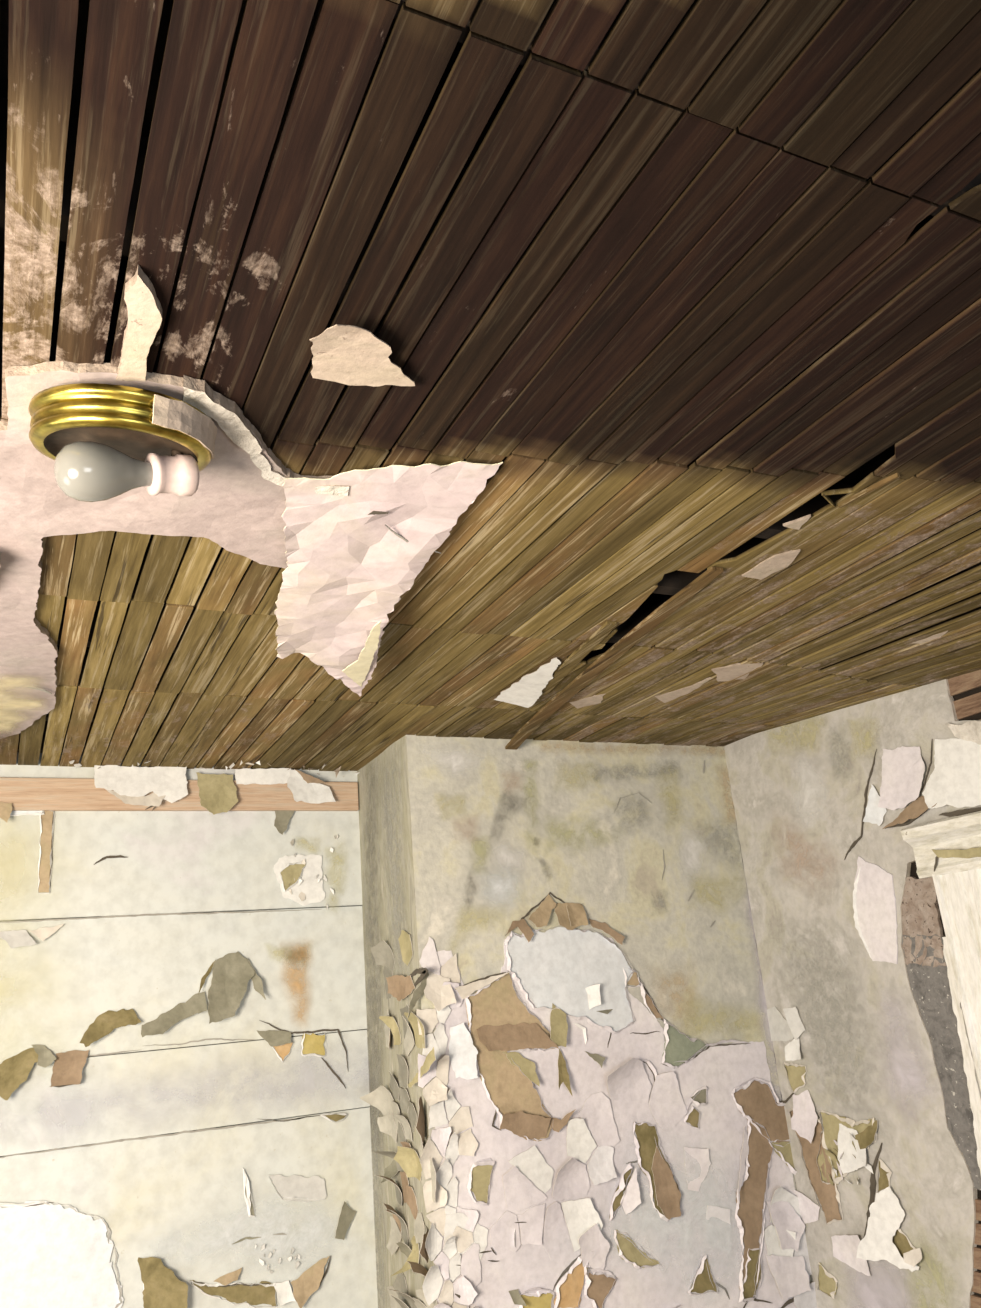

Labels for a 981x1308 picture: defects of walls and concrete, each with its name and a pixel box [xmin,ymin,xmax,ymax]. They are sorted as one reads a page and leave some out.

peeling [274,461,503,696]
peeling [0,802,55,894]
peeling [0,952,266,1100]
crack [88,1038,251,1056]
peeling [69,760,922,1308]
flaking render [844,670,981,1308]
peeling [0,1201,124,1308]